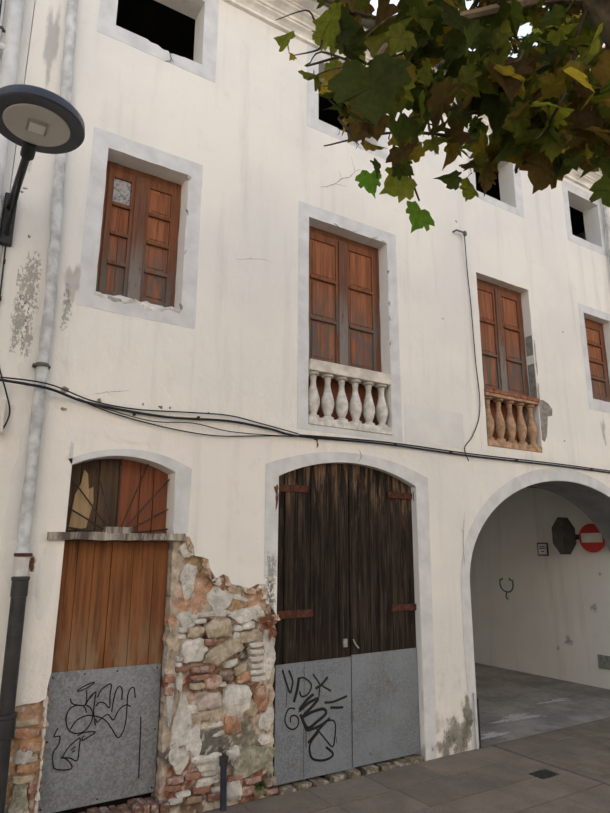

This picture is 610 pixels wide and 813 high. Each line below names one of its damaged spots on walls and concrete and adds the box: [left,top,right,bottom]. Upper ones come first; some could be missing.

spalling [4,688,50,813]
spalling [151,537,280,813]
water stain [433,696,473,757]